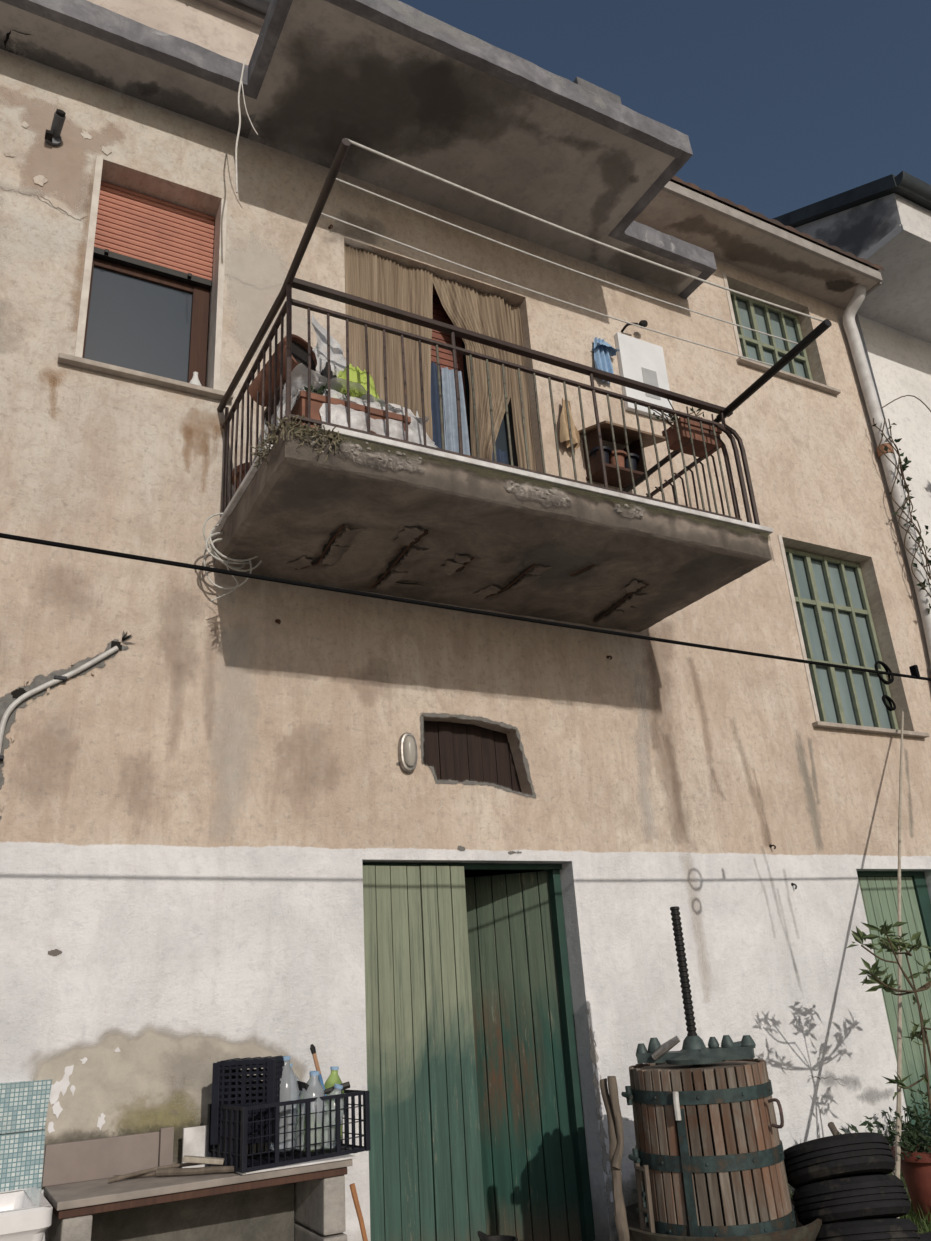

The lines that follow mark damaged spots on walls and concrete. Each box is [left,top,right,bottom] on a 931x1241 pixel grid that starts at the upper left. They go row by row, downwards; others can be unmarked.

leakage [384,0,483,44]
peeling [3,94,121,211]
leakage [675,219,858,292]
leakage [818,200,893,255]
spalling [505,481,573,507]
peeling [33,1028,304,1164]